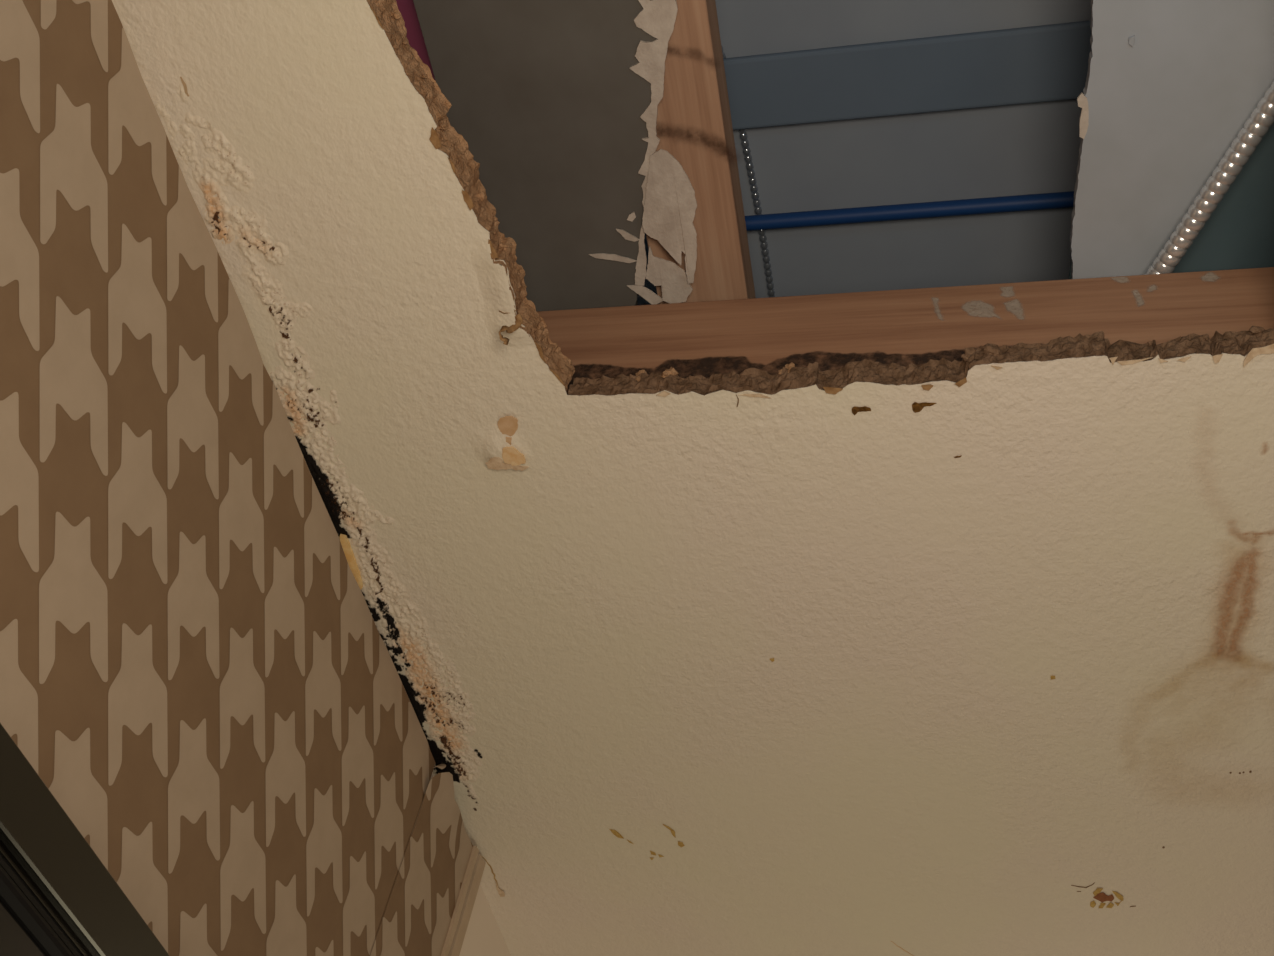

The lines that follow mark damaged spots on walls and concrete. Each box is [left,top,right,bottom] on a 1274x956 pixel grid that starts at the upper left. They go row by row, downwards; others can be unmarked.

spalling [367,0,1274,413]